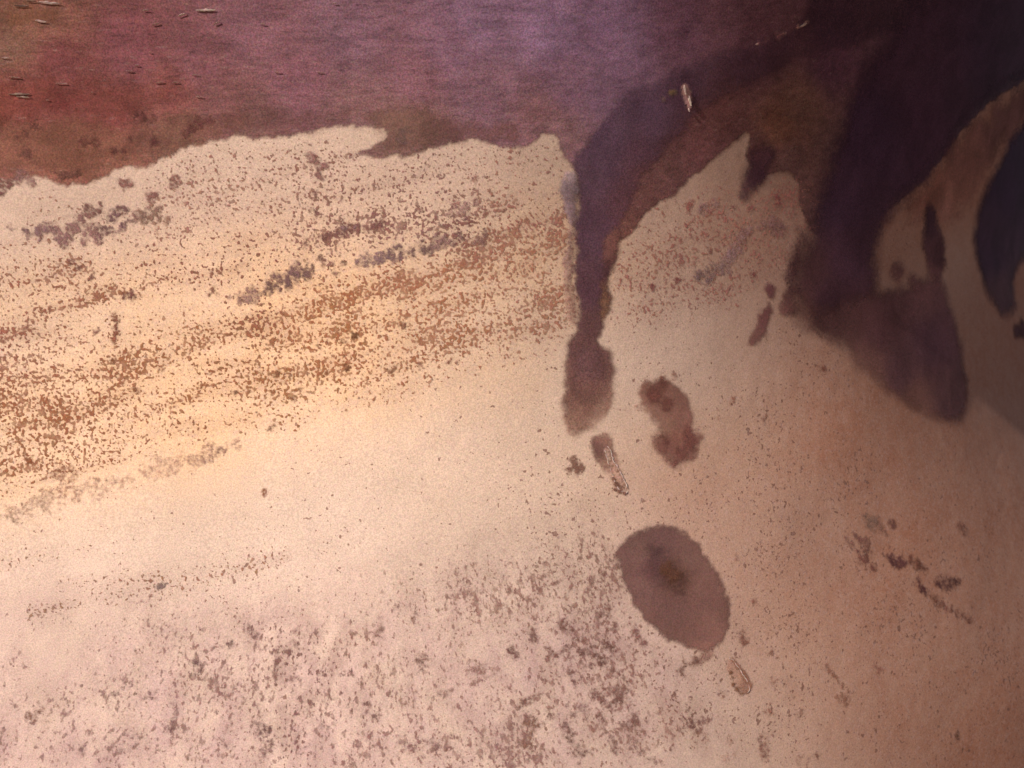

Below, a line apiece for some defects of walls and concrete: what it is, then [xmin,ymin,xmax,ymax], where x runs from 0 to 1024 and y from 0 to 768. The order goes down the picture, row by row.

corrosion [0,137,579,497]
damp [0,0,1024,433]
damp [639,370,702,466]
damp [25,509,730,768]